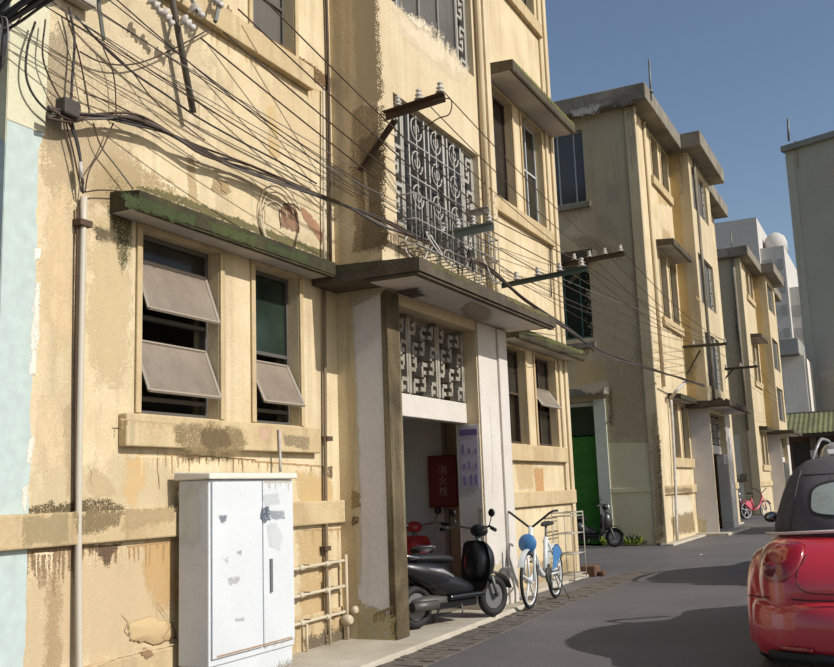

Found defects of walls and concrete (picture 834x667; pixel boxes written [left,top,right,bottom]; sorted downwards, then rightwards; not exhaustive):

water stain [39,116,201,393]
flaking render [252,195,328,247]
water stain [569,91,636,171]
water stain [569,175,708,545]
water stain [22,399,255,667]